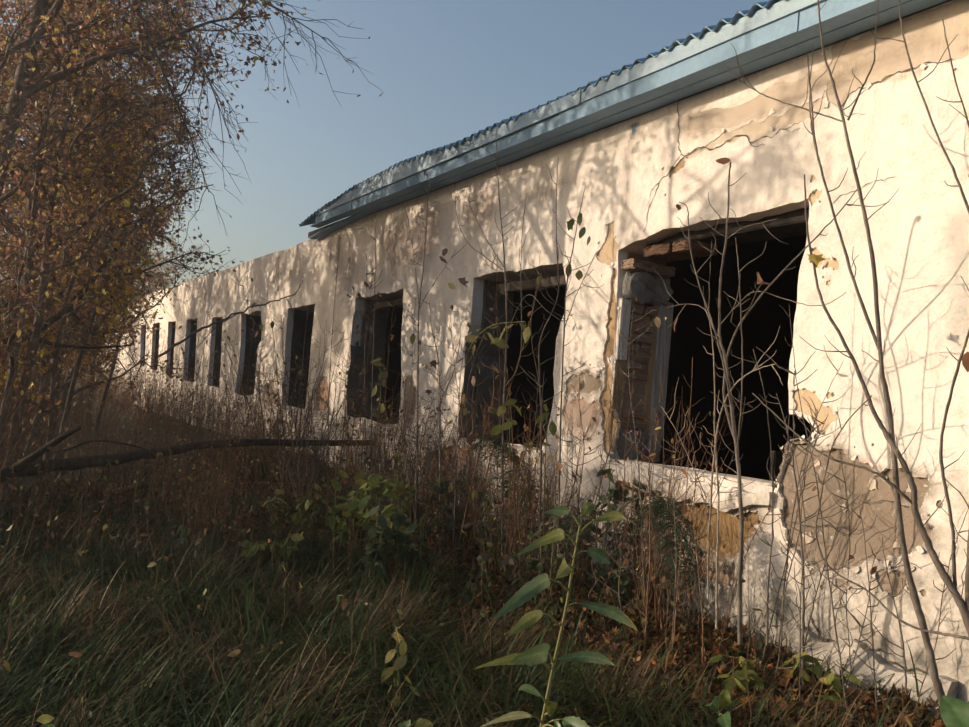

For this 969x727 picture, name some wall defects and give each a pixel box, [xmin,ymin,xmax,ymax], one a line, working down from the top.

crack [643,102,801,232]
peeling [662,0,969,178]
peeling [562,222,621,456]
peeling [675,501,761,591]
peeling [769,388,943,599]